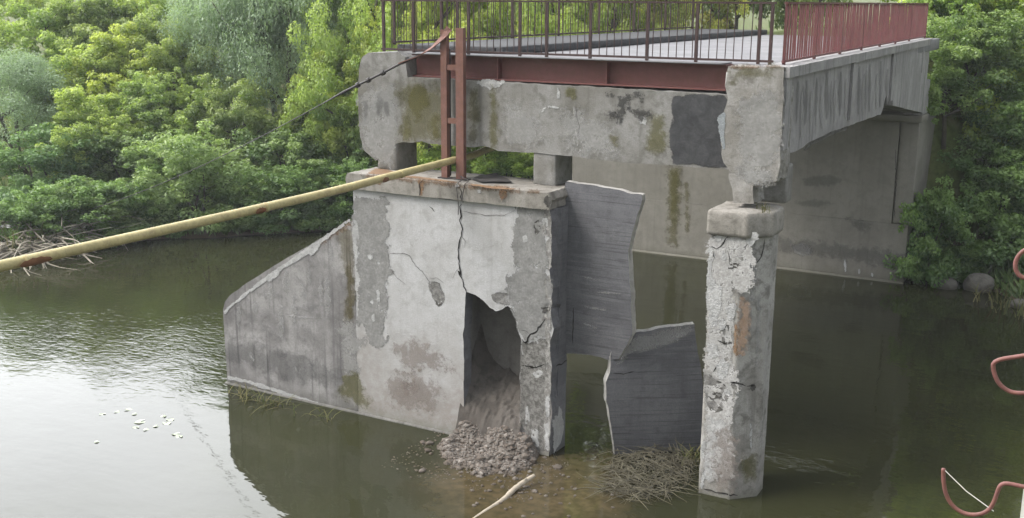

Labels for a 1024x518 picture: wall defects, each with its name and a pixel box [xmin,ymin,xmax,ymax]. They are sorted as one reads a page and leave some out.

rust [20,256,53,267]
peeling [224,196,395,349]
crack [390,184,515,293]
peeling [491,195,564,453]
crack [521,308,574,368]
peeling [700,232,759,489]
rust [733,297,751,356]